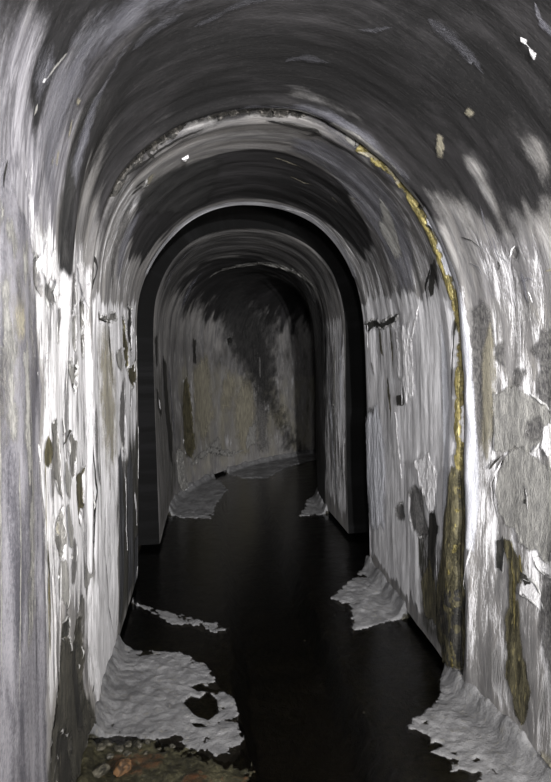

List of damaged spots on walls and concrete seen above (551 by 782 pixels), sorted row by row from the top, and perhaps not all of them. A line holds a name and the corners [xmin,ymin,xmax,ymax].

spalling [33,252,61,343]
damp [0,86,104,782]
spalling [68,273,85,394]
damp [81,318,139,640]
flaking render [98,305,137,454]
damp [176,107,505,551]
damp [413,326,449,625]
damp [513,368,527,386]
flaking render [492,386,551,562]
damp [531,329,551,401]
damp [541,423,551,458]
spalling [49,418,97,782]